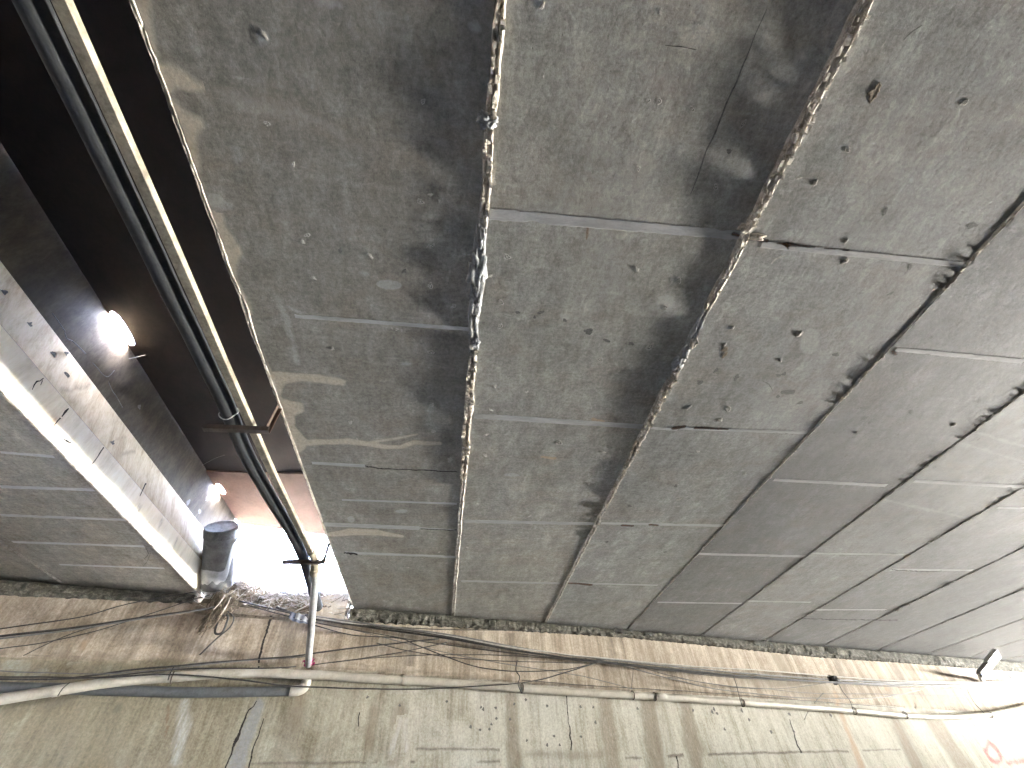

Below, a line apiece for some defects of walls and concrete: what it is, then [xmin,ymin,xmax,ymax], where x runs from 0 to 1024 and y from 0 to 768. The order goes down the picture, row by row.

crack [690,9,767,194]
damp [261,292,444,457]
crack [366,465,457,473]